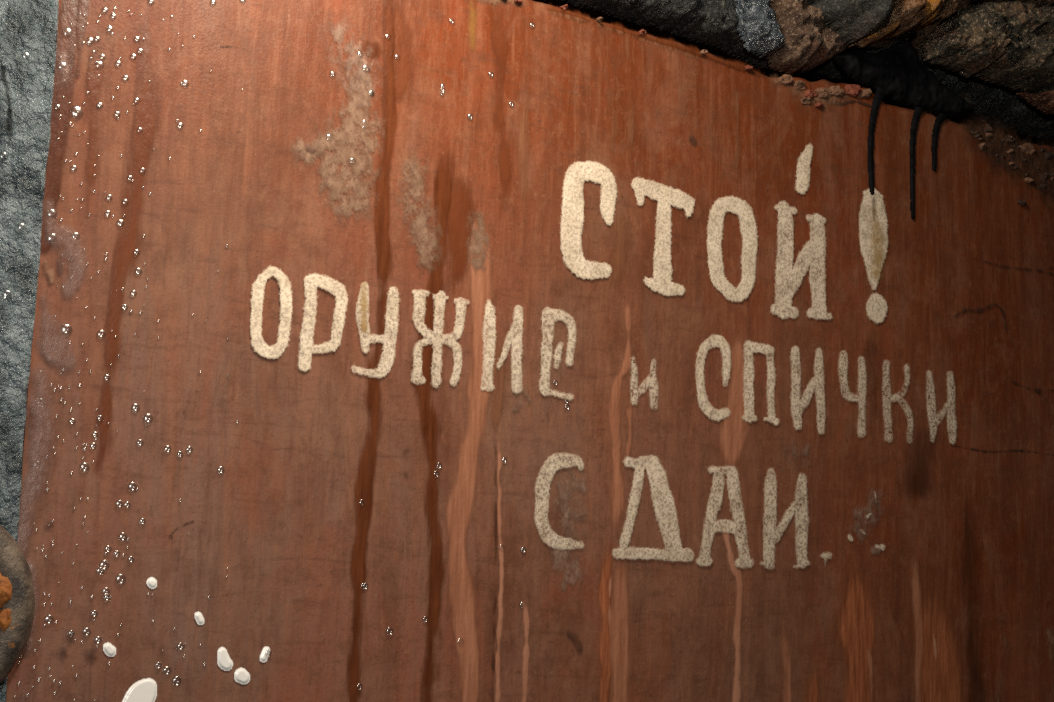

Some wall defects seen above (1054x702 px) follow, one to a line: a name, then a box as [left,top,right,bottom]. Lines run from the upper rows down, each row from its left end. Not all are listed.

leakage [399,160,439,269]
leakage [447,214,530,702]
leakage [609,305,632,529]
leakage [598,551,630,702]